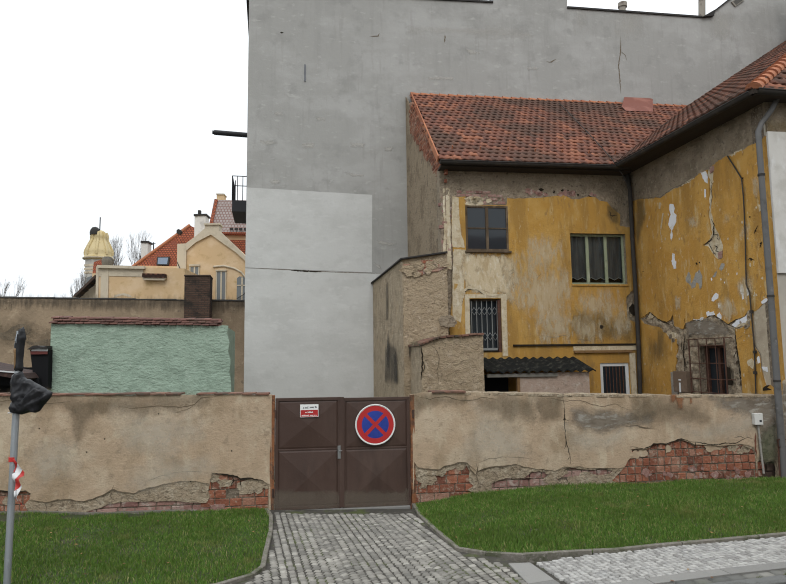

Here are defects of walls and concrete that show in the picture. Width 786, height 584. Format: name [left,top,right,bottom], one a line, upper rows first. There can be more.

crack [618,38,627,91]
spalling [398,102,767,338]
spalling [641,293,768,395]
crack [542,398,752,462]
spalling [0,473,275,512]
spalling [410,439,778,509]